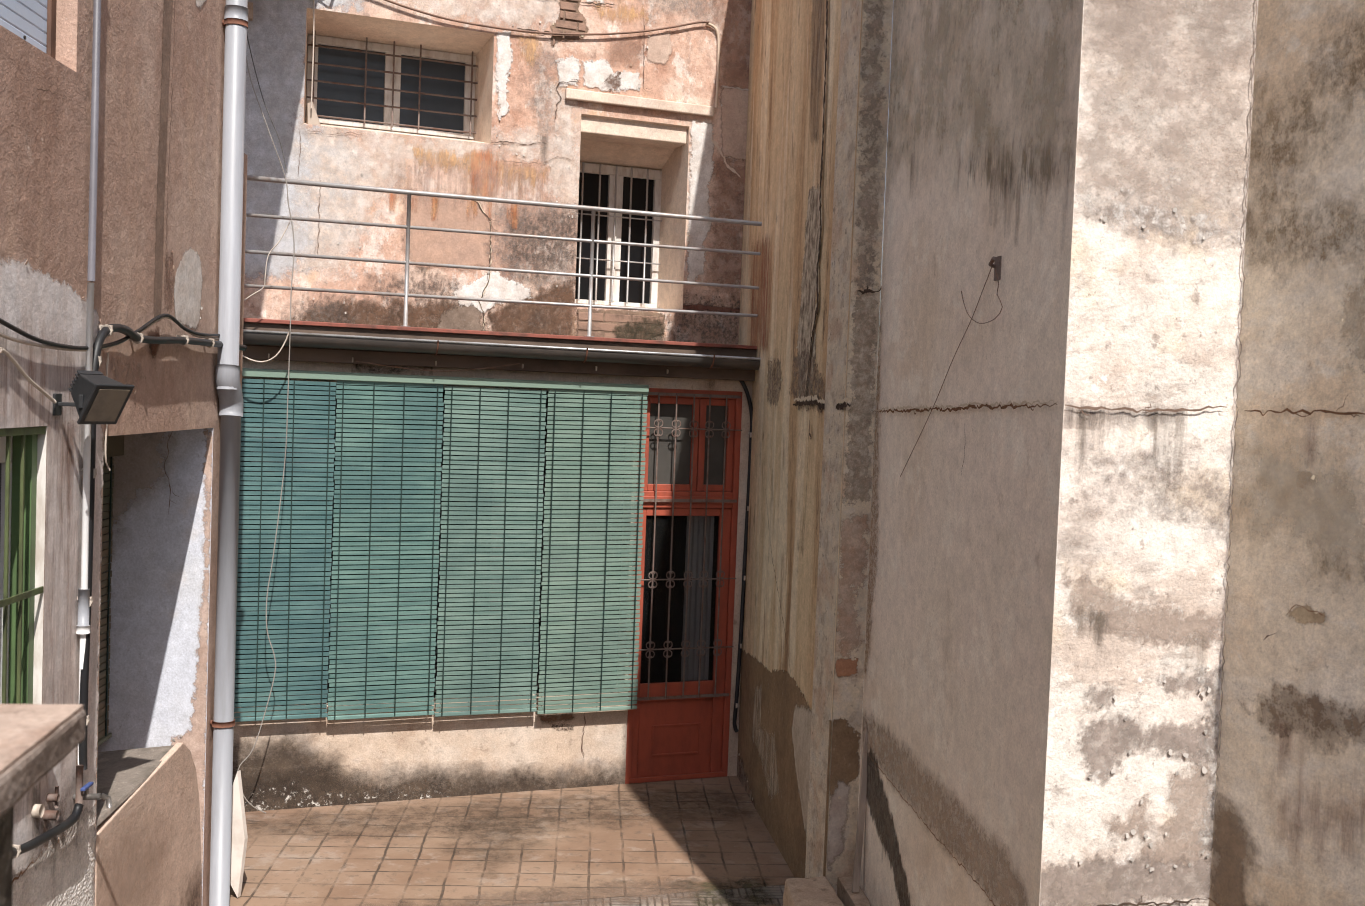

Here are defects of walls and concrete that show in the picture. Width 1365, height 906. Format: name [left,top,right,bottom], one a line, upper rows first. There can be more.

spalling [539,0,593,68]
spalling [589,72,621,92]
water stain [855,0,1365,288]
water stain [291,206,578,336]
peeling [766,185,825,413]
peeling [0,259,104,876]
spalling [835,292,878,678]
crack [793,0,1365,906]
water stain [1062,511,1225,648]
water stain [232,738,626,812]
water stain [737,650,811,878]
water stain [823,715,1254,906]